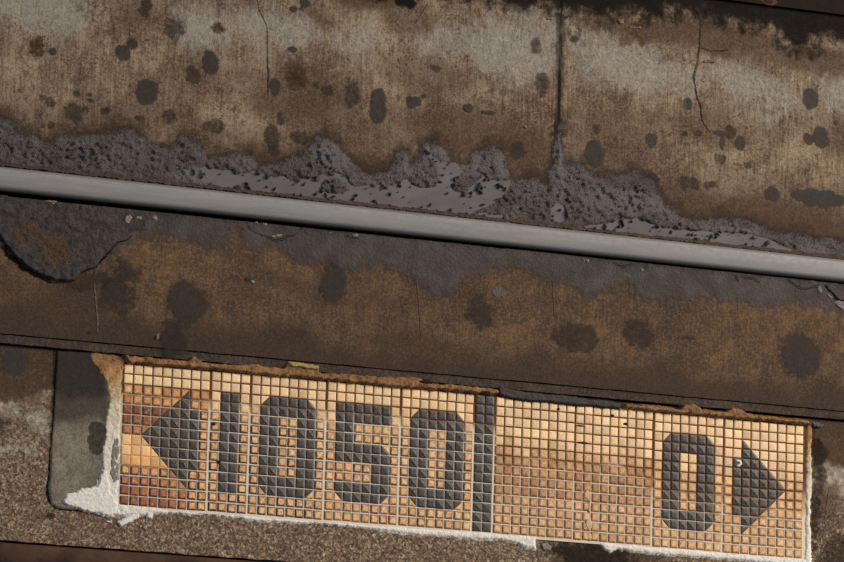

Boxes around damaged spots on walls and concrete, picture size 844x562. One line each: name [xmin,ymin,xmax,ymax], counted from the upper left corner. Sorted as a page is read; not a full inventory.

crack [257,0,269,95]
damp [418,12,694,101]
crack [693,21,728,131]
damp [704,55,804,126]
damp [0,440,38,456]
damp [0,401,51,442]
damp [810,431,844,562]